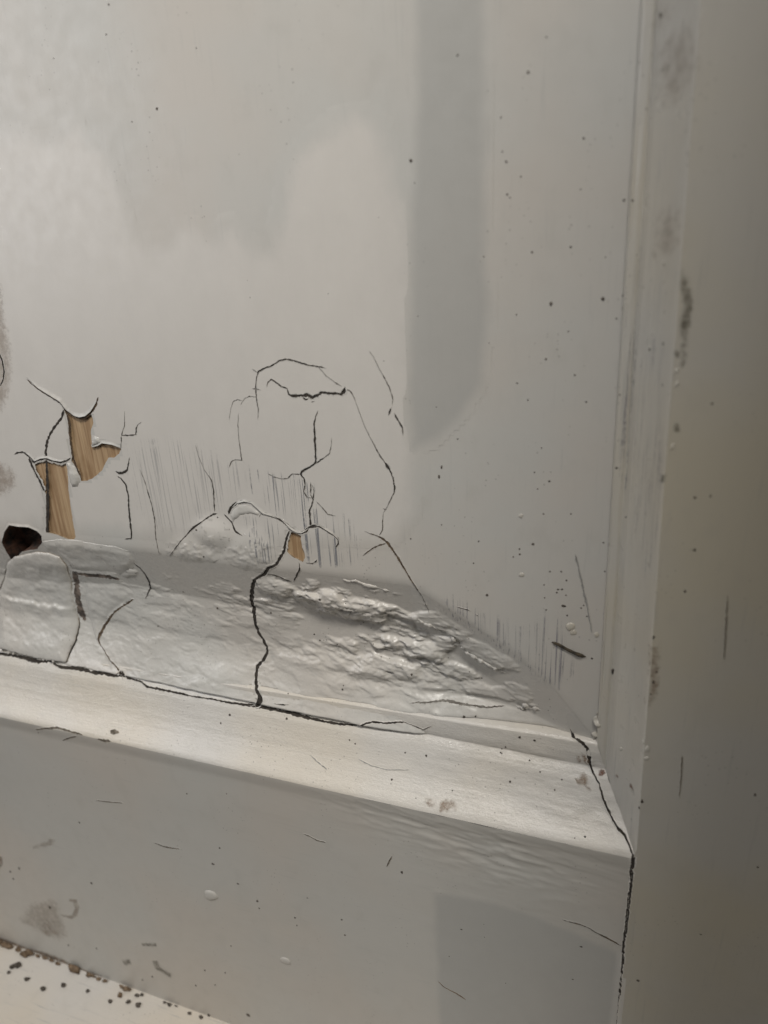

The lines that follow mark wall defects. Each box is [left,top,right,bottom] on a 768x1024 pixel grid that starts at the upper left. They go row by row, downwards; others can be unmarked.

peeling [0,377,135,662]
crack [0,352,504,730]
peeling [232,499,339,562]
crack [562,729,637,1024]